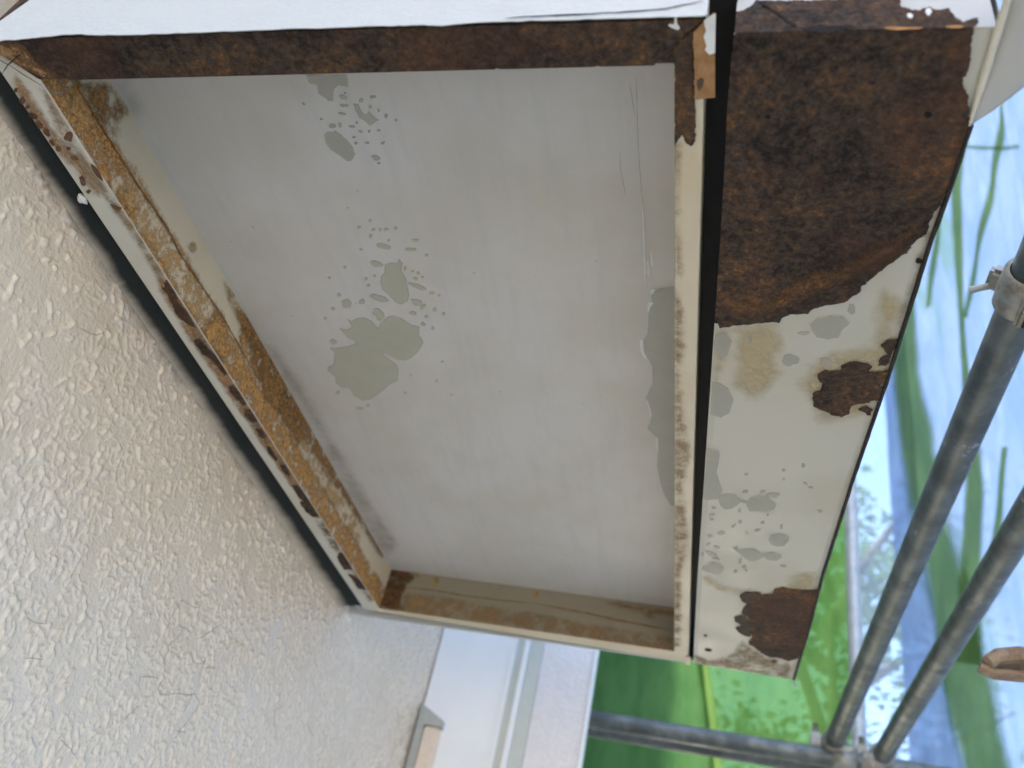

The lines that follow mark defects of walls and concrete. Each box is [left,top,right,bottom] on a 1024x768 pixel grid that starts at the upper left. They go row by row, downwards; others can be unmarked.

peeling [307,75,397,164]
rust [715,0,979,328]
rust [0,15,704,650]
peeling [324,239,445,410]
peeling [640,287,675,505]
peeling [710,382,733,418]
peeling [714,333,731,358]
peeling [797,304,855,339]
rust [812,338,897,417]
peeling [701,449,789,575]
rust [696,587,818,676]